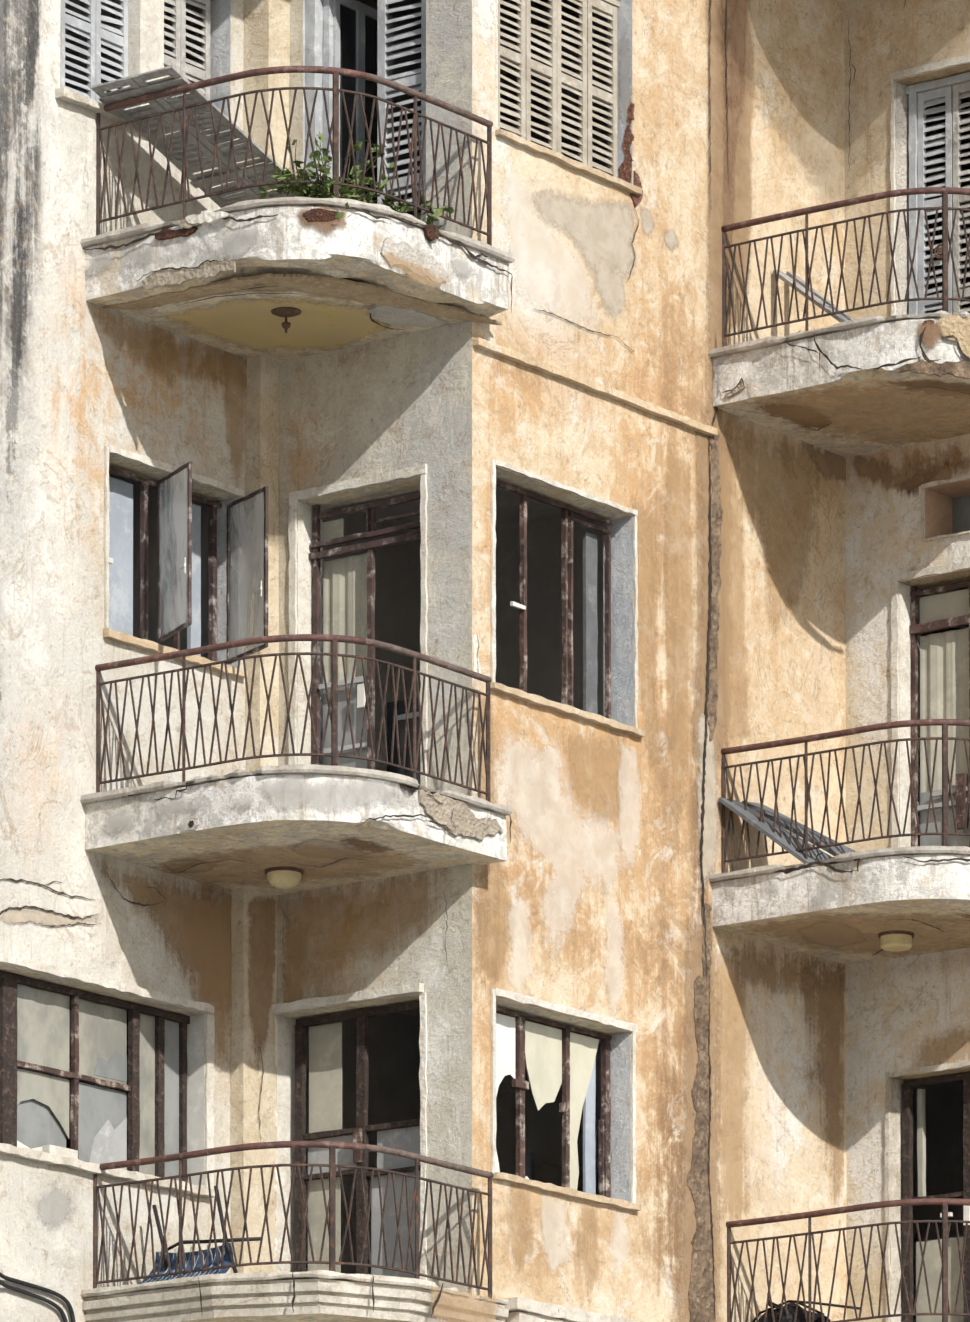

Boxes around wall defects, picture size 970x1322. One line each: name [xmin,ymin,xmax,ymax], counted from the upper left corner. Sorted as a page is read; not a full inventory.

damp [0,0,39,172]
crack [82,230,172,250]
crack [223,214,278,222]
rust [296,207,347,232]
flaking render [527,39,679,319]
damp [5,208,28,473]
crack [783,326,959,370]
spalling [892,315,970,400]
peeling [232,777,512,842]
flaking render [0,905,100,928]
damp [101,860,232,1013]
damp [249,897,276,1067]